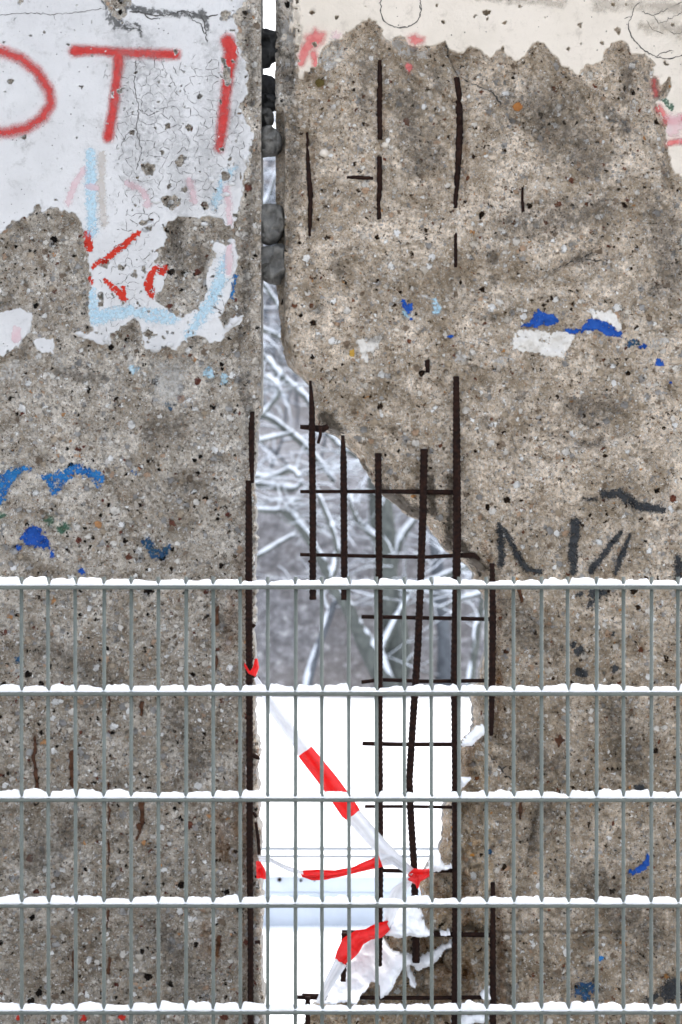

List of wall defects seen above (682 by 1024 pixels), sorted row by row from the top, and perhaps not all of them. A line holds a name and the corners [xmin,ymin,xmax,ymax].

spalling [0,0,265,1024]
crack [96,10,245,332]
spalling [275,0,682,1024]